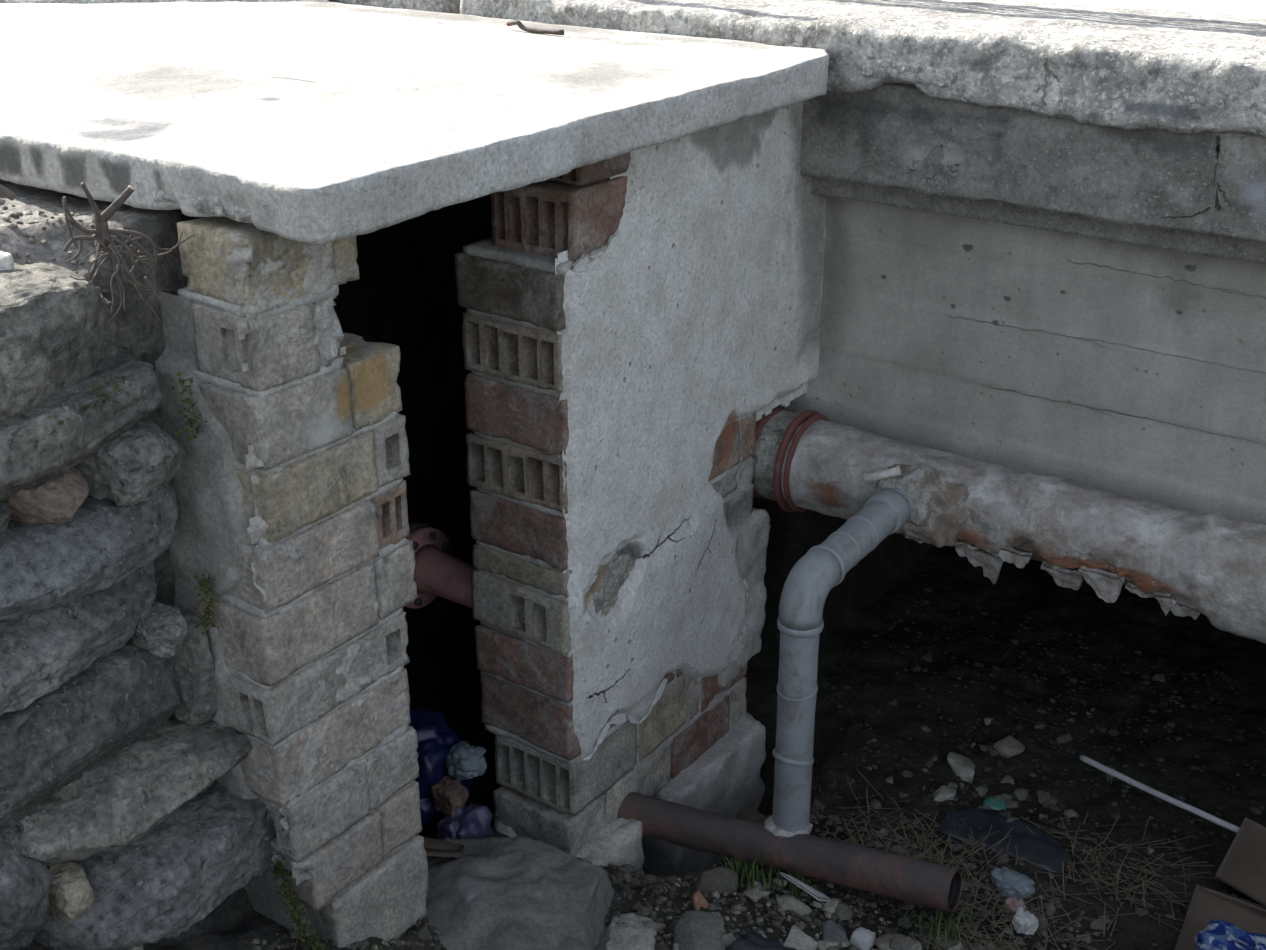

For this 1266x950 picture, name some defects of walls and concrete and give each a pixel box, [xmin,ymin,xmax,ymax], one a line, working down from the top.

damp [87,128,157,139]
crack [1164,135,1231,218]
peeling [569,231,621,273]
crack [638,516,717,570]
spalling [589,549,634,613]
crack [588,669,630,703]
peeling [582,678,668,761]